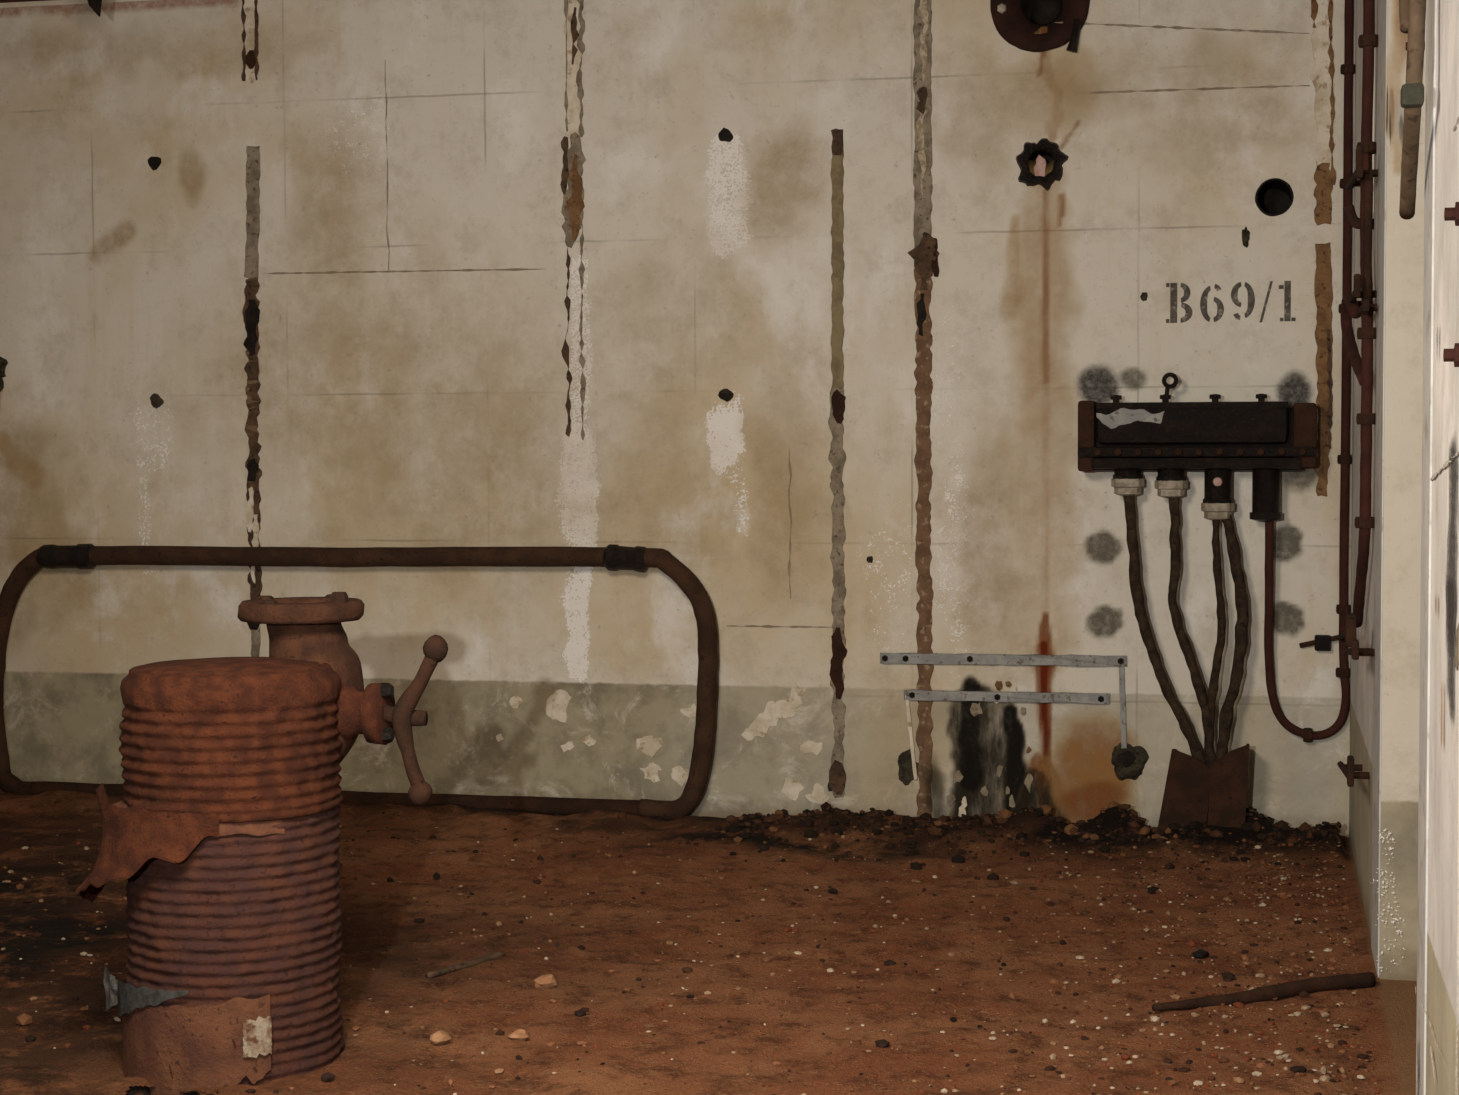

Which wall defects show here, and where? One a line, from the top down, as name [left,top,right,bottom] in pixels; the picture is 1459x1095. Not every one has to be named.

damp [701,130,754,259]
spalling [0,357,8,392]
damp [555,254,602,547]
damp [703,389,752,536]
damp [559,566,595,684]
rust [1028,614,1072,822]